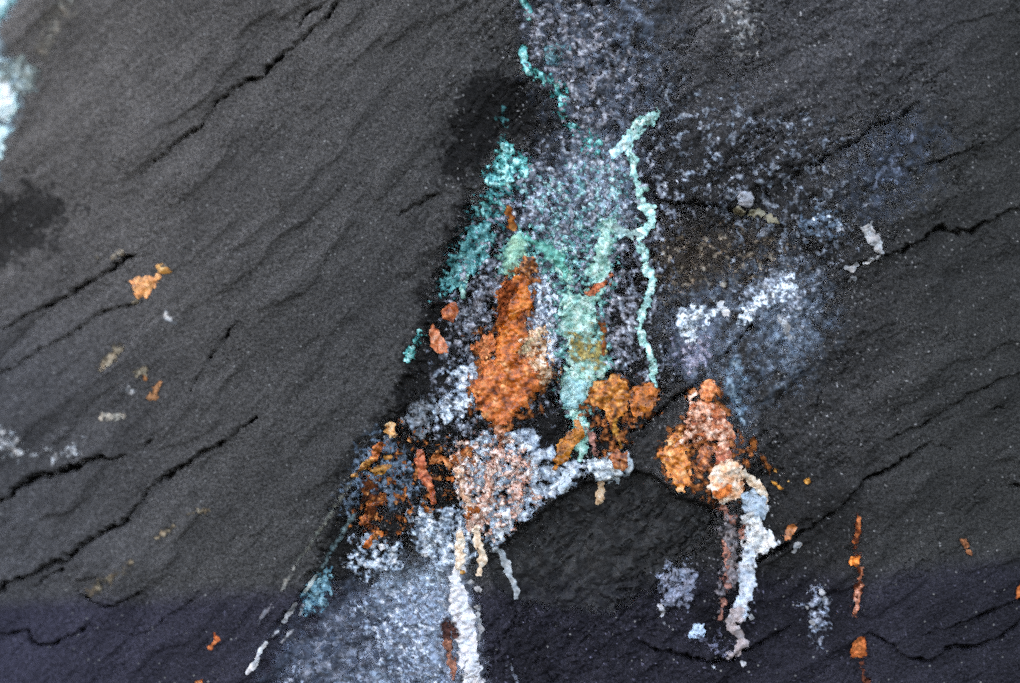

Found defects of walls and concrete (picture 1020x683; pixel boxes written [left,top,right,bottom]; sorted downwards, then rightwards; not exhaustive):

crack [247,53,284,81]
crack [9,255,134,327]
corrosion [129,263,172,305]
crack [11,454,116,496]
crack [164,441,224,477]
corrosion [347,418,476,549]
crack [863,420,928,480]
crack [758,529,802,561]
crack [1,549,79,588]
corrosion [848,516,864,617]
corrosion [850,637,871,683]